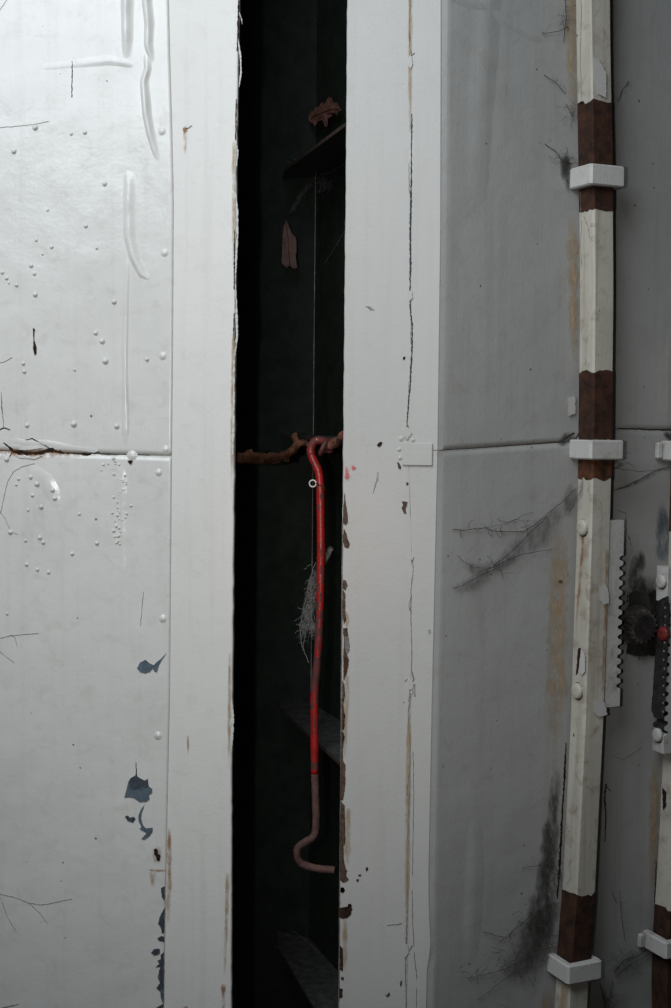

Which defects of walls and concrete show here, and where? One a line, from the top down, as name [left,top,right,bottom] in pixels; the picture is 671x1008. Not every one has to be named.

crack [407,0,415,69]
crack [401,114,413,438]
crack [0,392,119,534]
peeling [137,655,165,673]
peeling [124,768,153,840]
peeling [339,580,368,893]
crack [403,553,417,1008]
peeling [152,886,165,1008]
peeling [338,904,352,919]